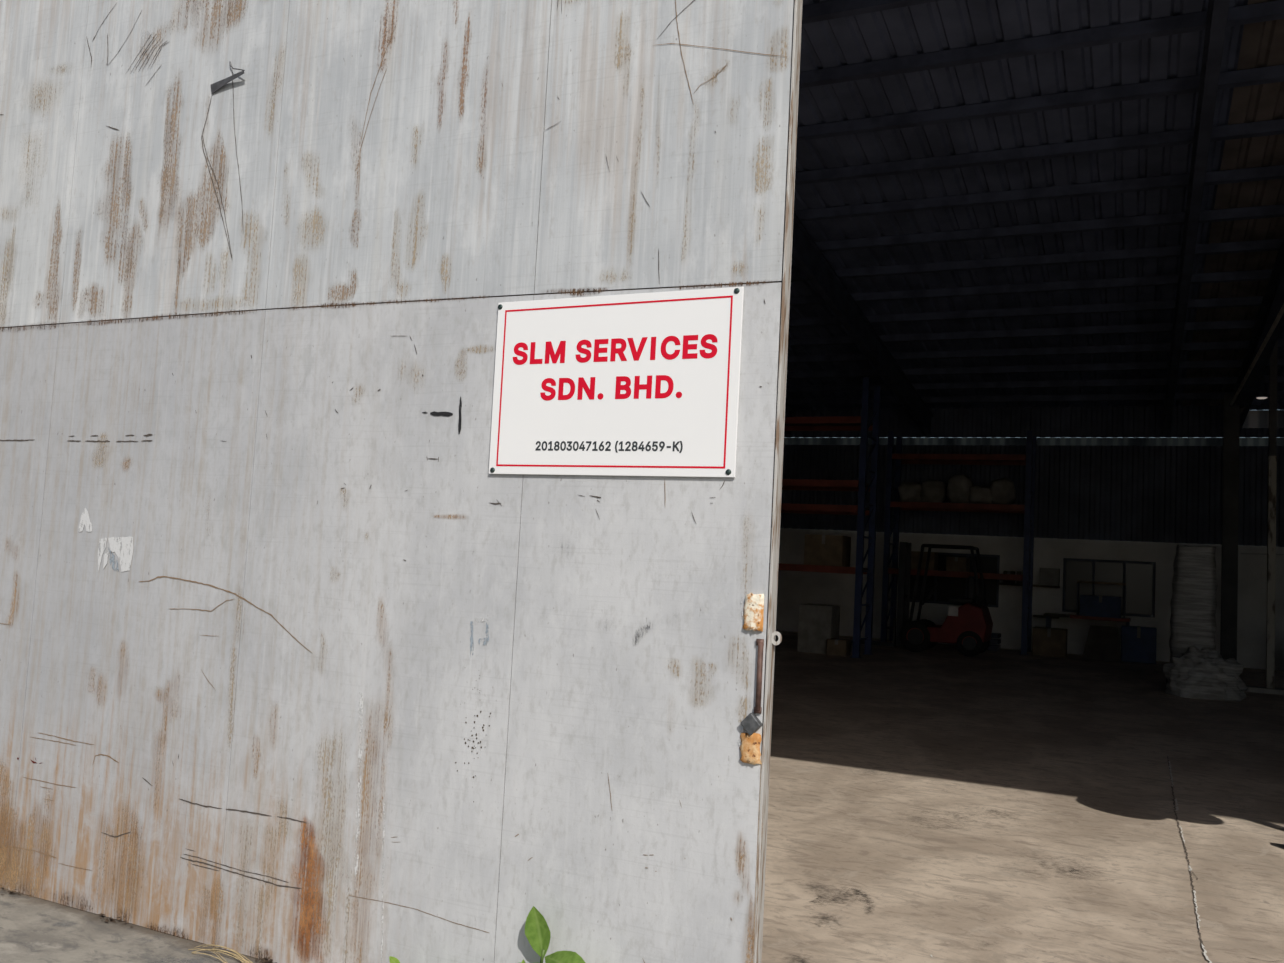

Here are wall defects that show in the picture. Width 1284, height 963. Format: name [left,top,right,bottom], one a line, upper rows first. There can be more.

rust [178,0,246,46]
rust [379,0,397,70]
rust [455,2,470,115]
rust [0,81,259,331]
rust [293,195,484,309]
rust [680,265,766,289]
peeling [98,536,133,572]
rust [267,711,390,963]
crack [1167,756,1210,963]